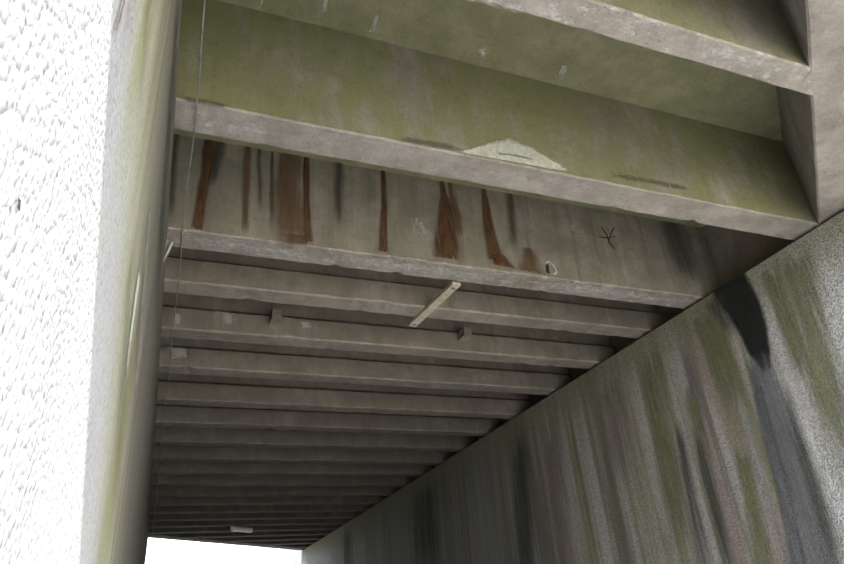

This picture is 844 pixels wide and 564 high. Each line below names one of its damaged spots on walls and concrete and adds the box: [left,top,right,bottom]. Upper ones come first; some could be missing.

rust [192,139,223,230]
rust [242,146,251,227]
rust [270,151,312,245]
rust [379,170,388,252]
rust [435,181,462,259]
rust [481,188,542,274]
damp [710,273,834,564]